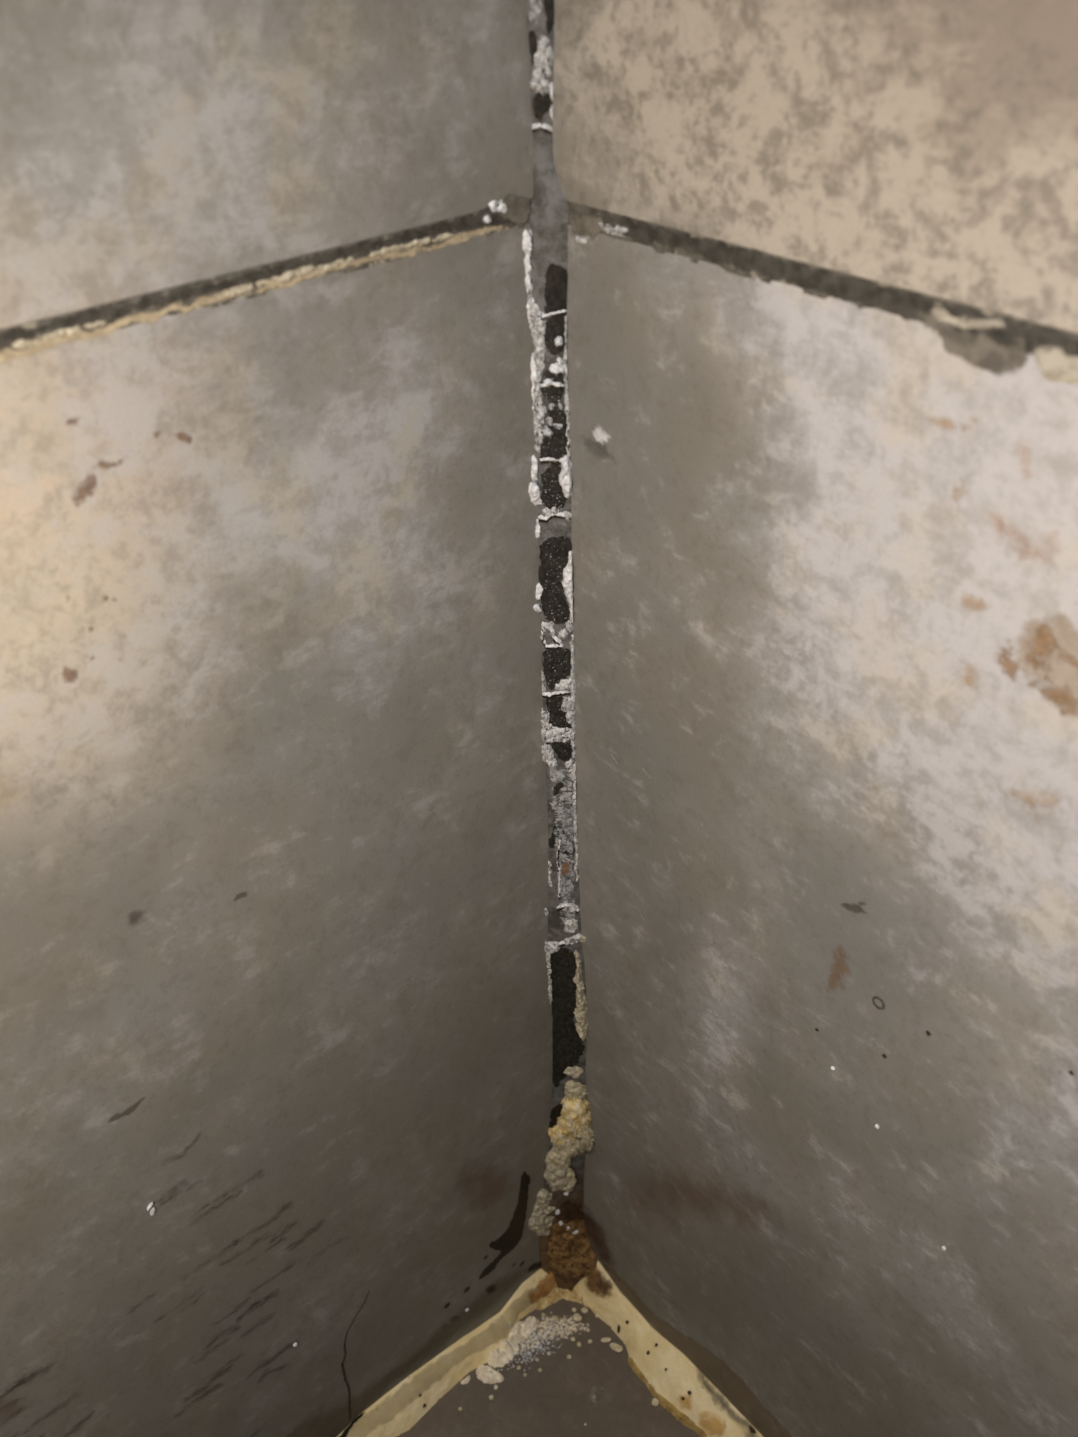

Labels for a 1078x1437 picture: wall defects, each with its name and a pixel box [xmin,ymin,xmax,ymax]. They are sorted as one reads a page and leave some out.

rust [998,625,1078,715]
leakage [464,1149,577,1293]
crack [339,1290,370,1437]
leakage [461,1315,589,1390]